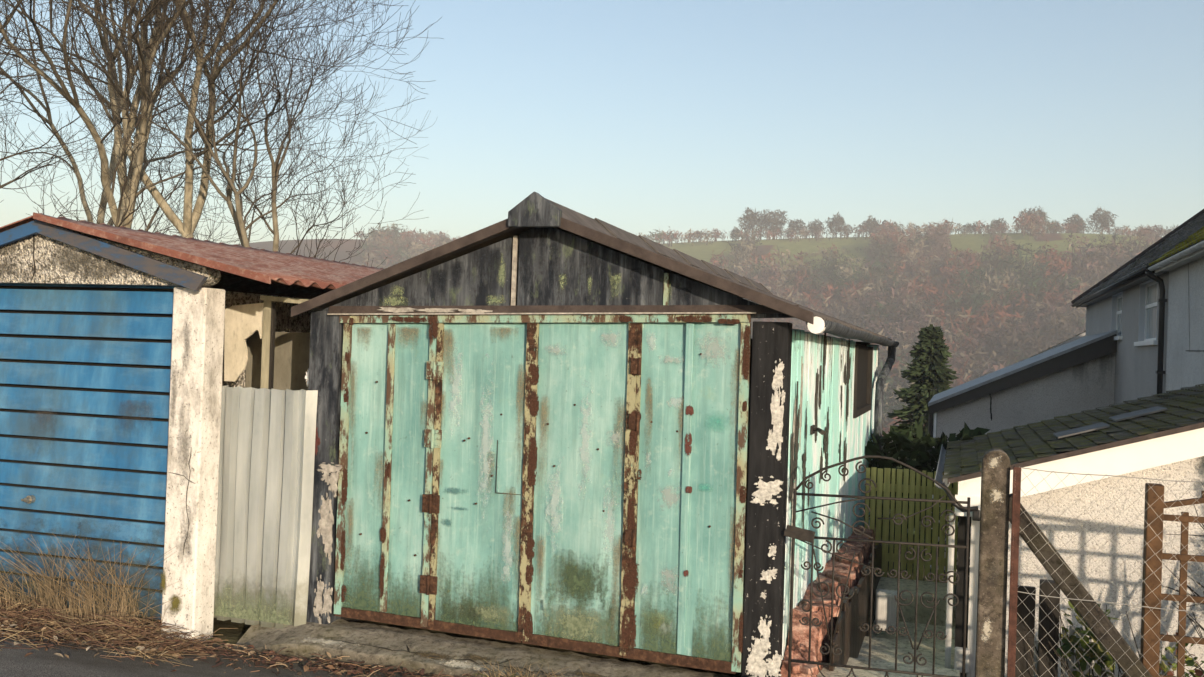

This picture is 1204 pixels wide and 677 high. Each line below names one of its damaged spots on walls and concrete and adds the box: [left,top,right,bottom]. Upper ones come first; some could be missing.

peeling [313,462,343,624]
corrosion [509,491,544,585]
corrosion [517,362,548,487]
corrosion [615,385,652,652]
peeling [750,333,851,623]
corrosion [524,610,533,640]
peeling [745,615,783,677]